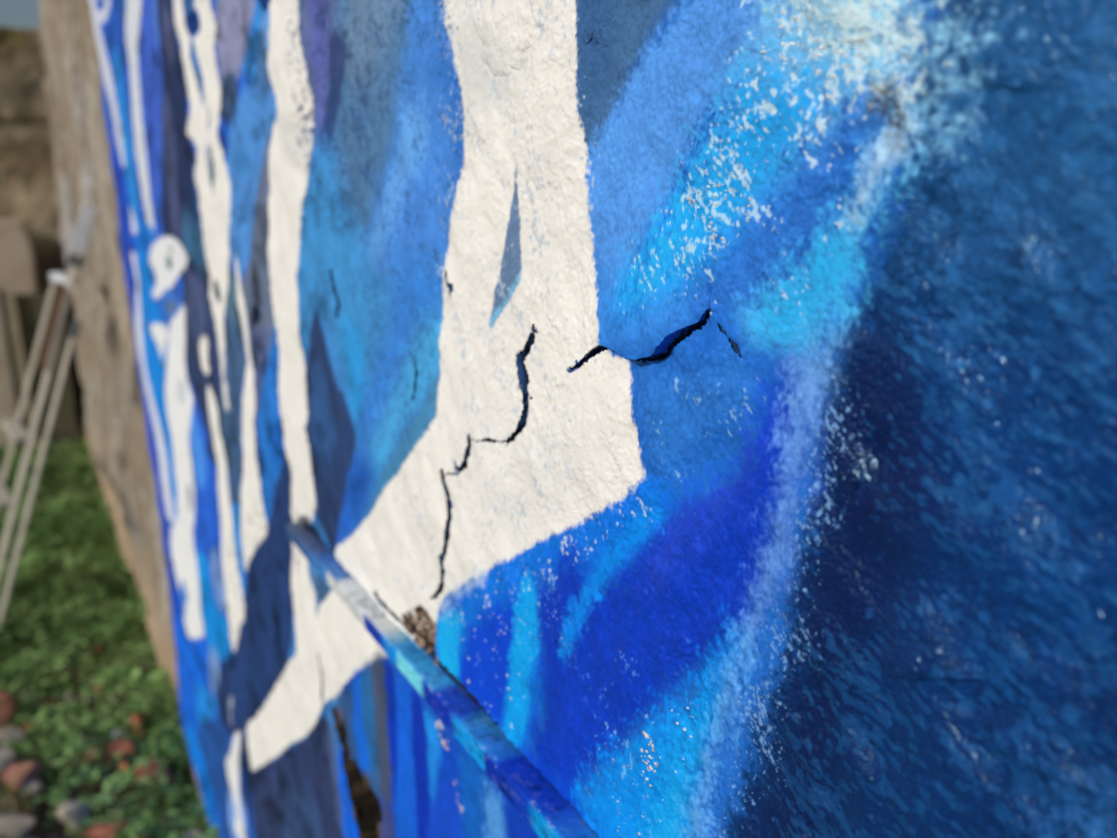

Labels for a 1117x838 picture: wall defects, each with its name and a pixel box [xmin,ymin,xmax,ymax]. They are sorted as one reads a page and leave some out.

crack [566,346,608,373]
crack [636,307,742,362]
crack [432,324,538,599]
spalling [402,604,438,667]
spalling [328,705,382,838]